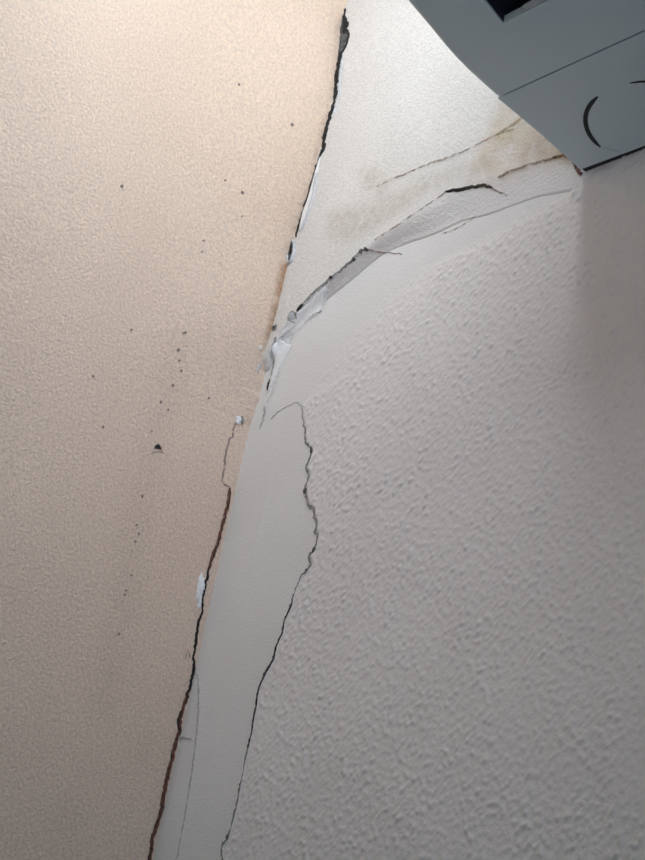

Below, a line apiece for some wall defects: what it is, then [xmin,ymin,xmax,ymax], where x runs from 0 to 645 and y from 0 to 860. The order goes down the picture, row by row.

flaking render [286,157,321,264]
crack [295,8,350,237]
crack [270,154,583,375]
crack [377,120,520,187]
flaking render [258,280,336,396]